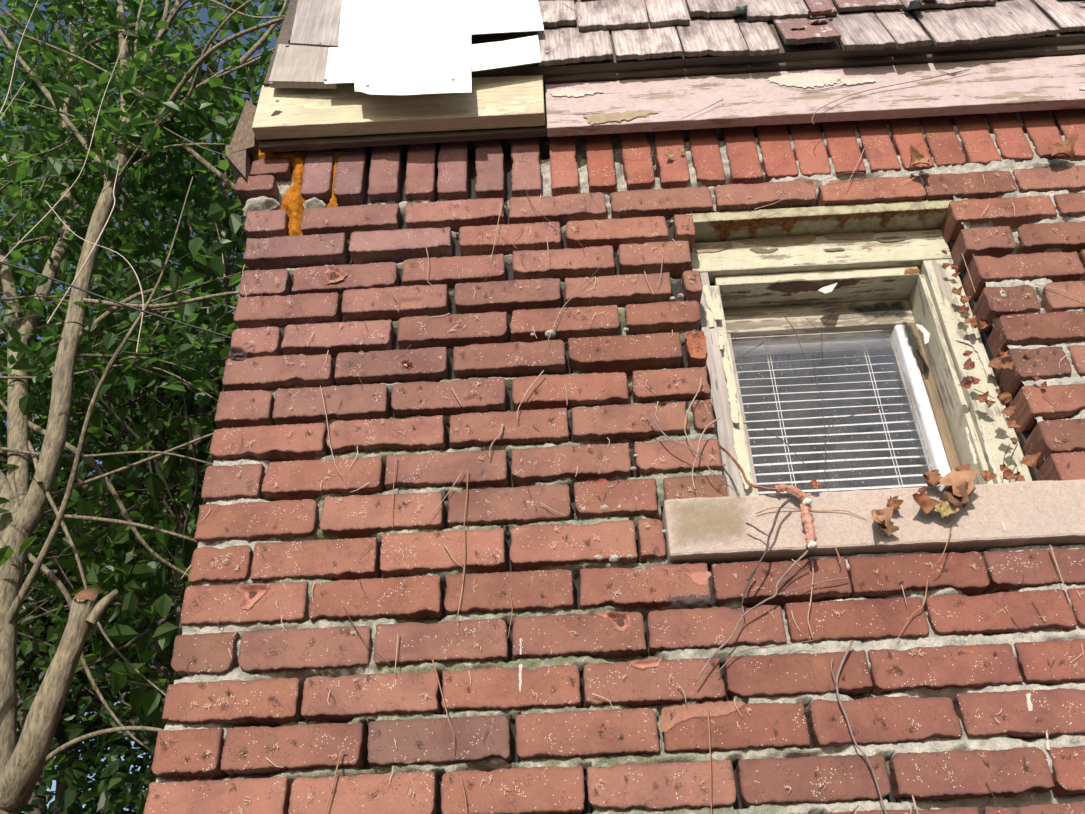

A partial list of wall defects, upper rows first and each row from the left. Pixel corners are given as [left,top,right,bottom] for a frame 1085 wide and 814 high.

peeling [767,72,881,88]
rust [711,208,948,242]
spalling [326,266,347,284]
peeling [761,279,871,304]
spalling [237,583,270,609]
spalling [597,611,630,631]
spalling [660,701,745,732]